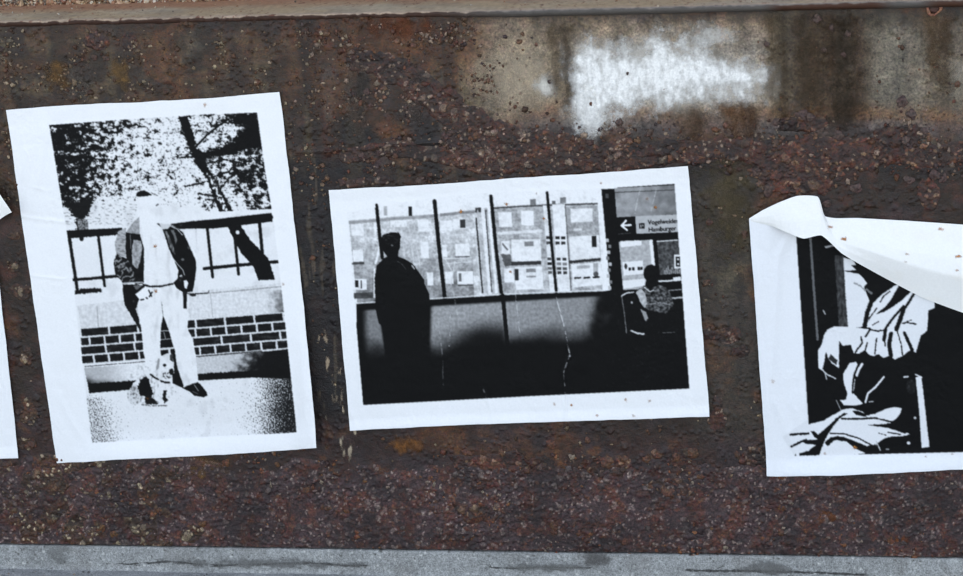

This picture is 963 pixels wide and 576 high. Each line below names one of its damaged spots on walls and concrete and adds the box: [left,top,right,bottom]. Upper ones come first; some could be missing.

corrosion [0,21,963,211]
damp [569,29,767,128]
corrosion [6,261,32,300]
corrosion [20,347,33,366]
corrosion [703,324,758,365]
corrosion [0,395,963,558]